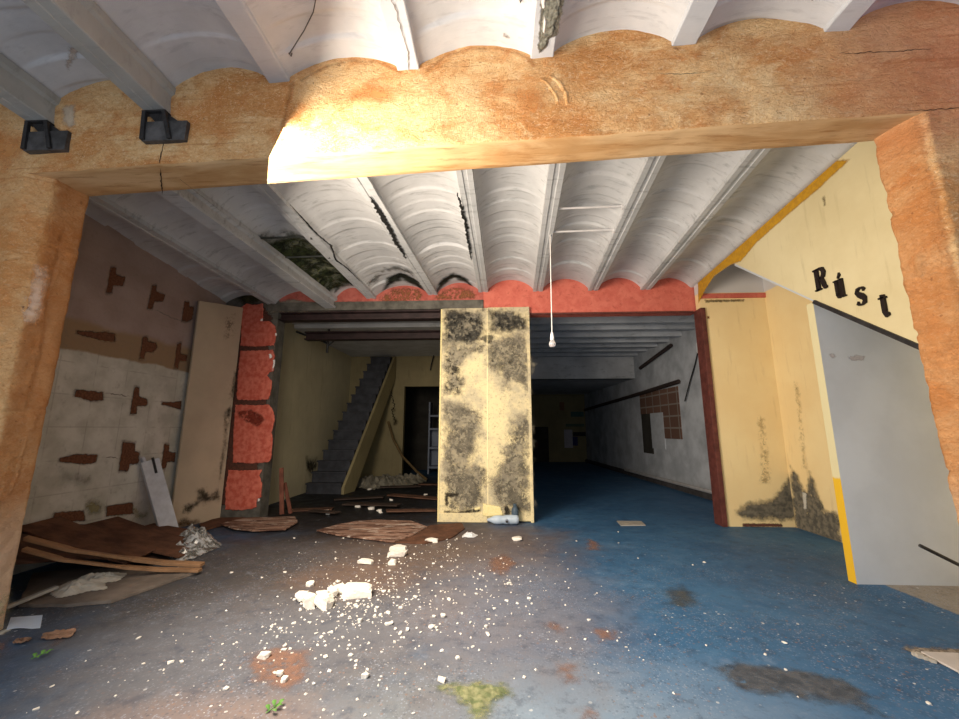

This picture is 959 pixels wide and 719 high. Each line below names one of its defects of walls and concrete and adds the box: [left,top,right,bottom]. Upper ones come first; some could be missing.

spalling [538,0,565,53]
crack [159,144,223,213]
crack [290,205,360,281]
crack [370,197,406,259]
crack [457,193,472,260]
flaking render [221,303,277,510]
leakage [444,310,530,515]
leakage [738,472,842,542]